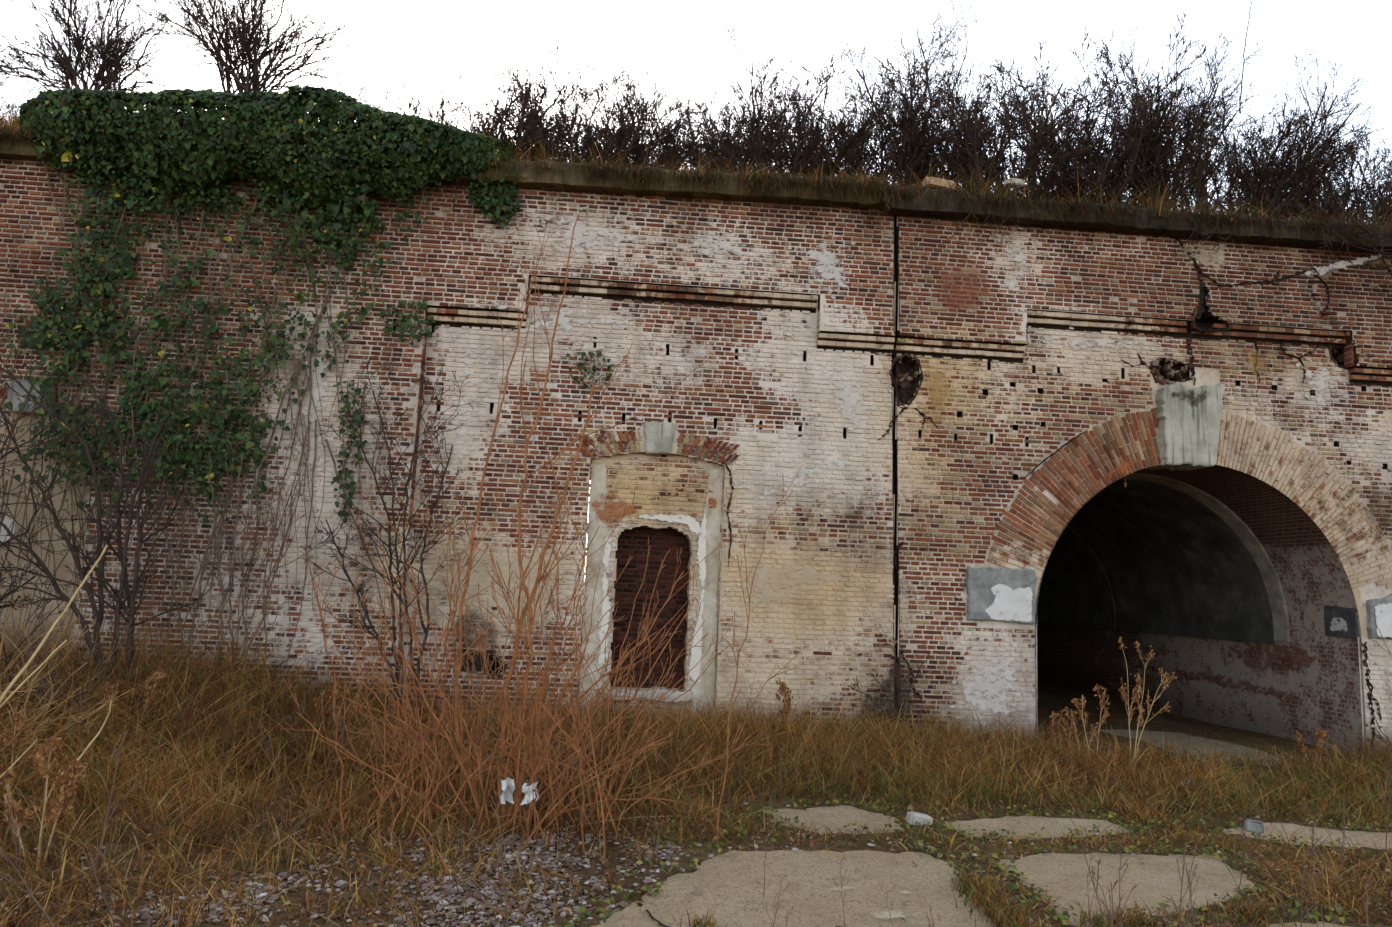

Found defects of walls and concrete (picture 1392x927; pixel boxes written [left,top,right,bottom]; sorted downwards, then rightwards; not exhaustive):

crack [1174,237,1392,385]
peeling [785,325,877,431]
spalling [889,353,924,410]
spalling [1022,327,1195,385]
crack [1121,353,1153,370]
spalling [985,584,1033,622]
spalling [1375,603,1392,638]
crack [645,909,670,927]